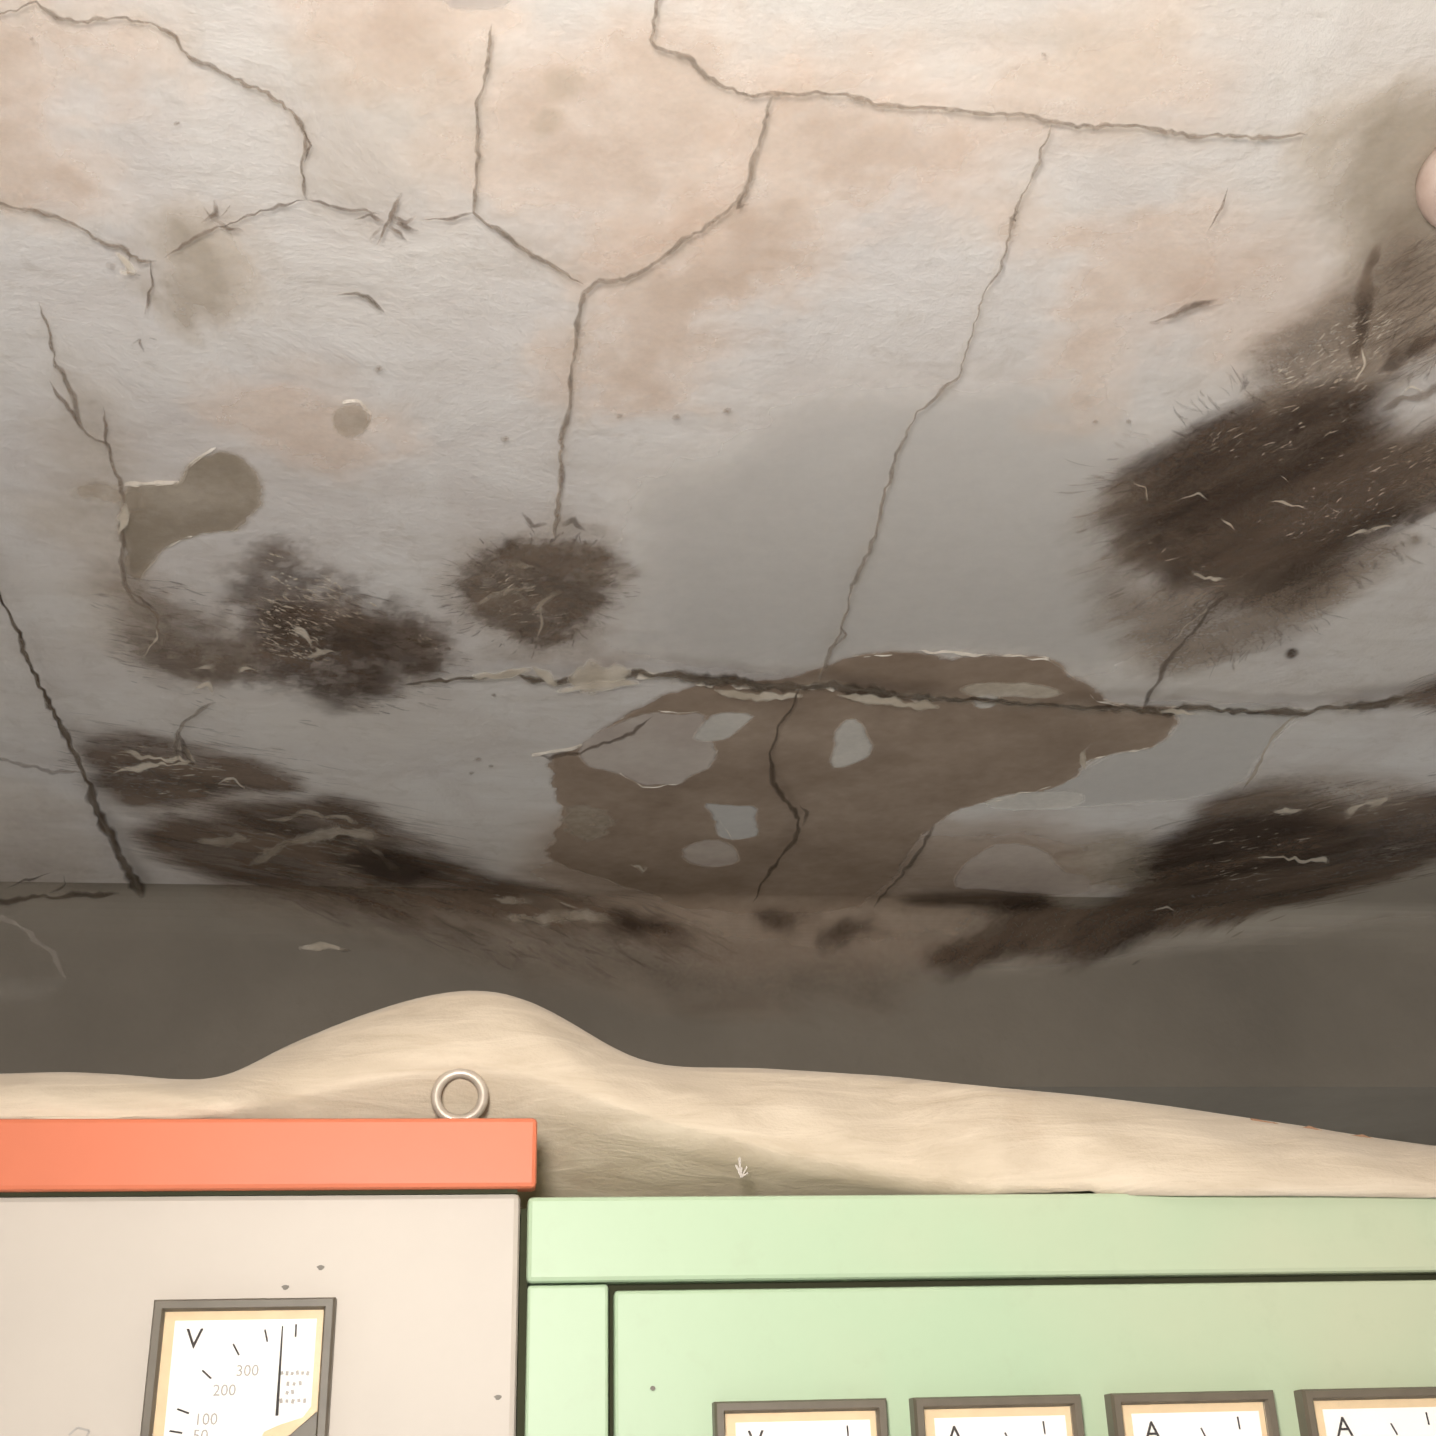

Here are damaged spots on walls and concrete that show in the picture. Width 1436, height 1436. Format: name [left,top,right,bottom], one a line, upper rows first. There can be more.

peeling [443,0,510,11]
peeling [75,447,263,581]
crack [0,0,1417,906]
leakage [92,20,1436,716]
leakage [58,701,1436,1006]
peeling [532,650,1179,915]